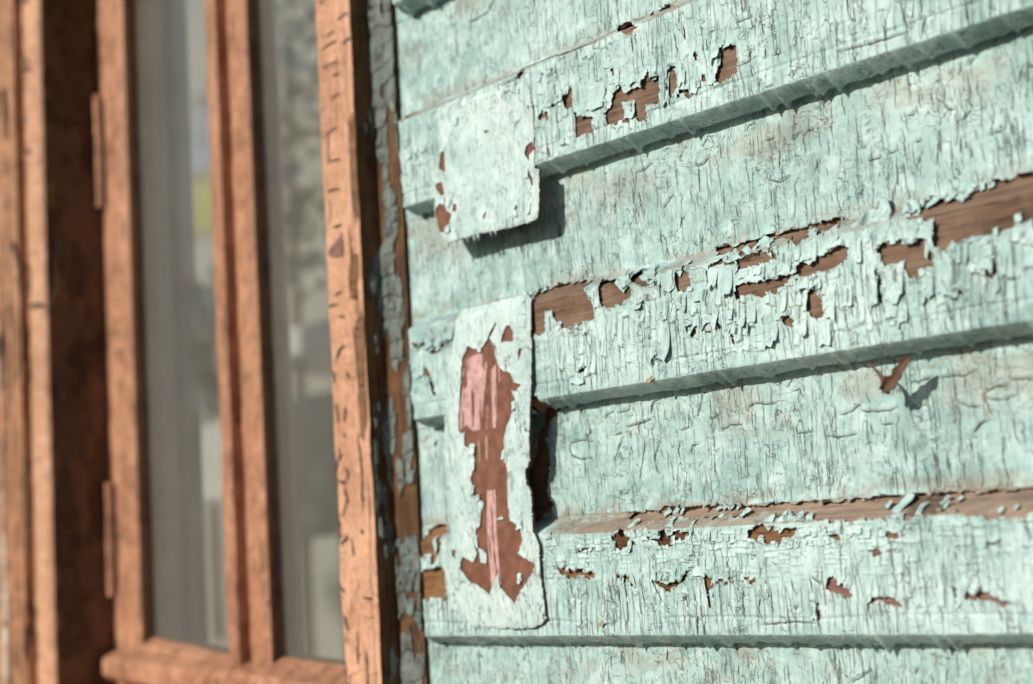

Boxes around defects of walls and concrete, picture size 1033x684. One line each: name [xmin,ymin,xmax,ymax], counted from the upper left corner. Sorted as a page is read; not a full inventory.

crack [482,2,708,90]
crack [737,4,781,77]
crack [843,0,925,51]
peeling [527,39,738,145]
peeling [522,171,1033,365]
peeling [327,0,561,684]
crack [567,380,802,476]
crack [912,371,1033,478]
peeling [611,487,1033,557]
peeling [650,555,756,609]
crack [730,578,821,625]
peeling [825,576,902,608]